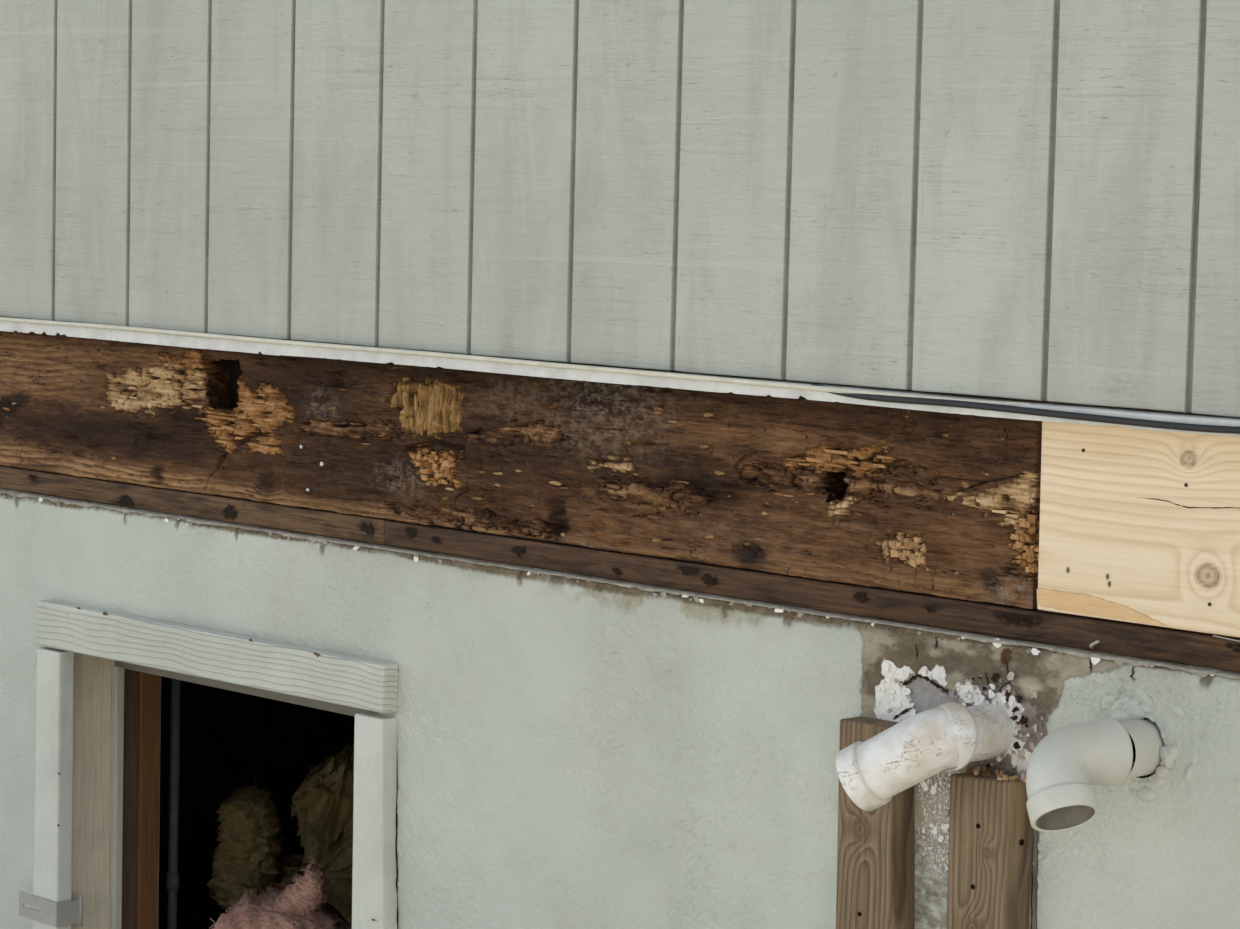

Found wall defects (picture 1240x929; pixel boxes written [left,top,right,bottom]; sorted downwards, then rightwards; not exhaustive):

water stain [0,474,1240,686]
peeling [0,490,1240,928]